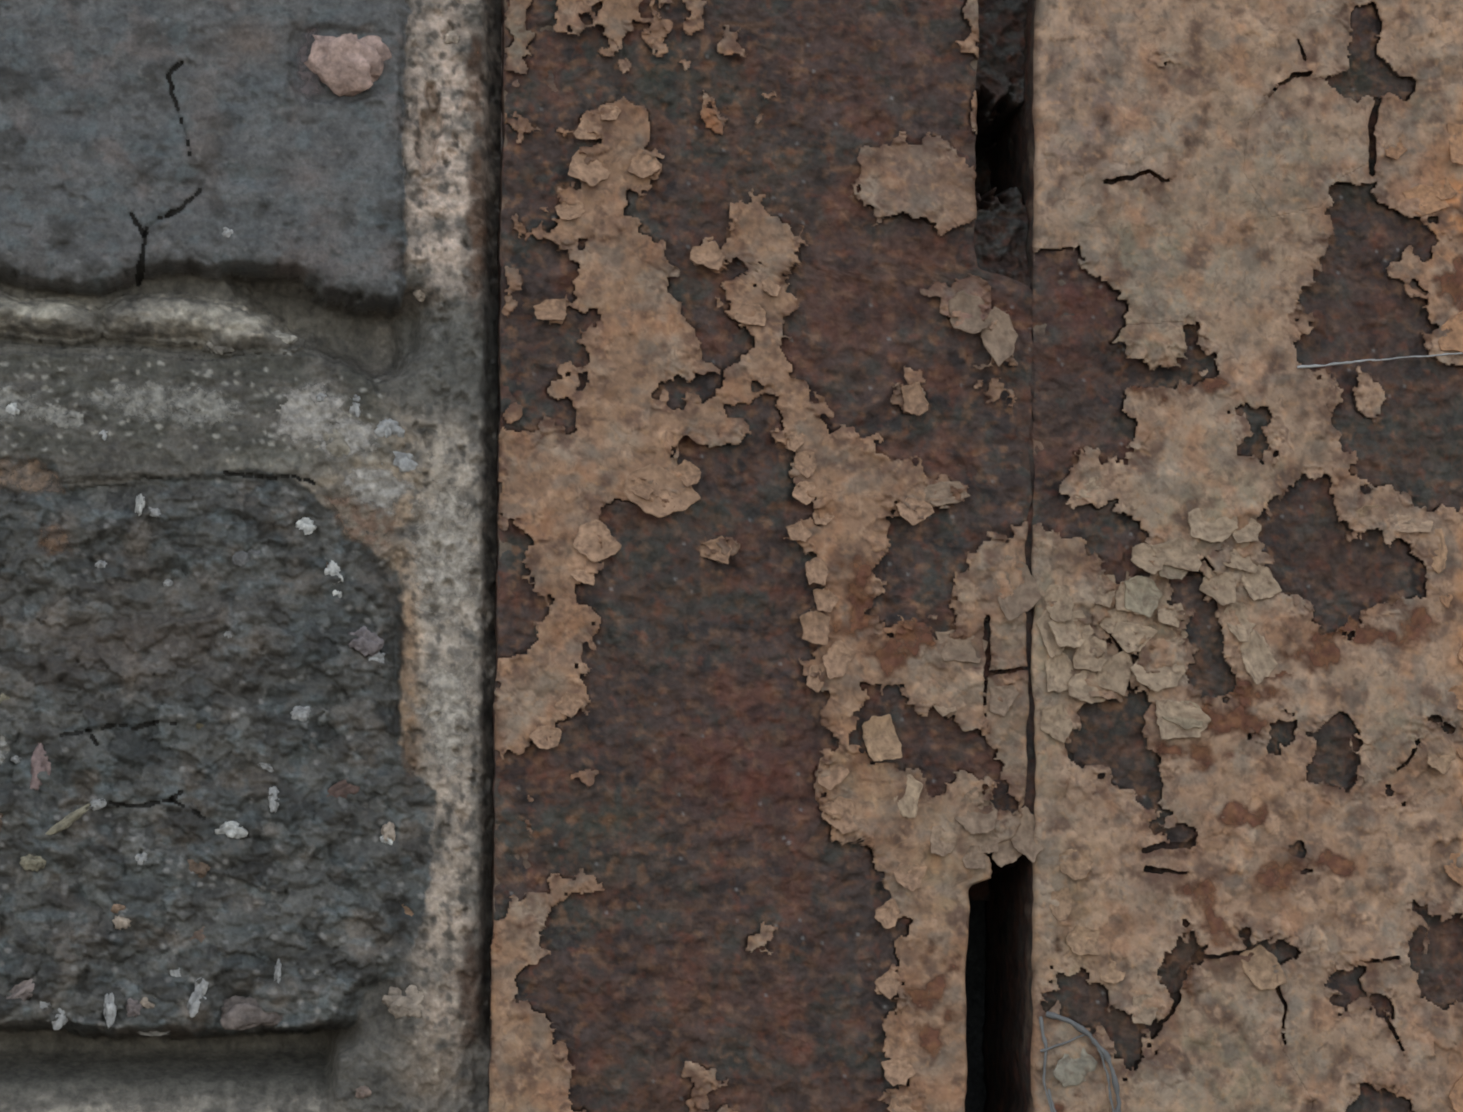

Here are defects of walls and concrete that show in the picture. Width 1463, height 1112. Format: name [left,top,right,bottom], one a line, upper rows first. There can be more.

crack [130,61,202,287]
crack [1103,169,1170,184]
crack [1368,97,1381,176]
corrosion [467,0,1463,1112]